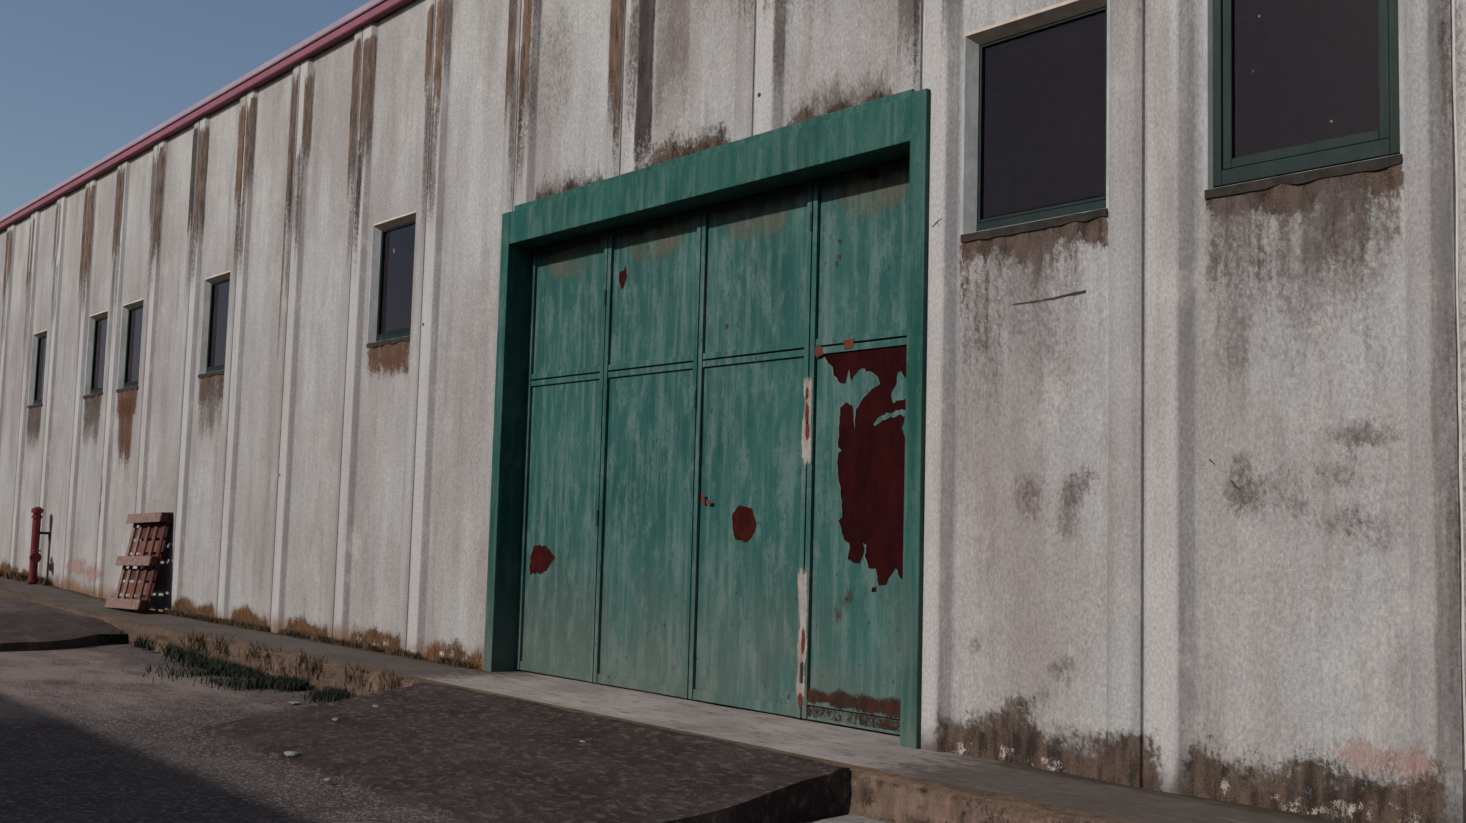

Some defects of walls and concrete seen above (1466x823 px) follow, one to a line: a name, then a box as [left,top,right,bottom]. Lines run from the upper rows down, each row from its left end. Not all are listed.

water stain [347,35,377,252]
water stain [422,0,453,216]
water stain [504,0,541,201]
water stain [608,0,726,171]
water stain [960,215,1109,364]
water stain [1206,164,1404,291]
peeling [529,544,555,575]
peeling [731,505,756,542]
peeling [801,376,813,469]
peeling [815,338,907,592]
peeling [796,568,808,709]